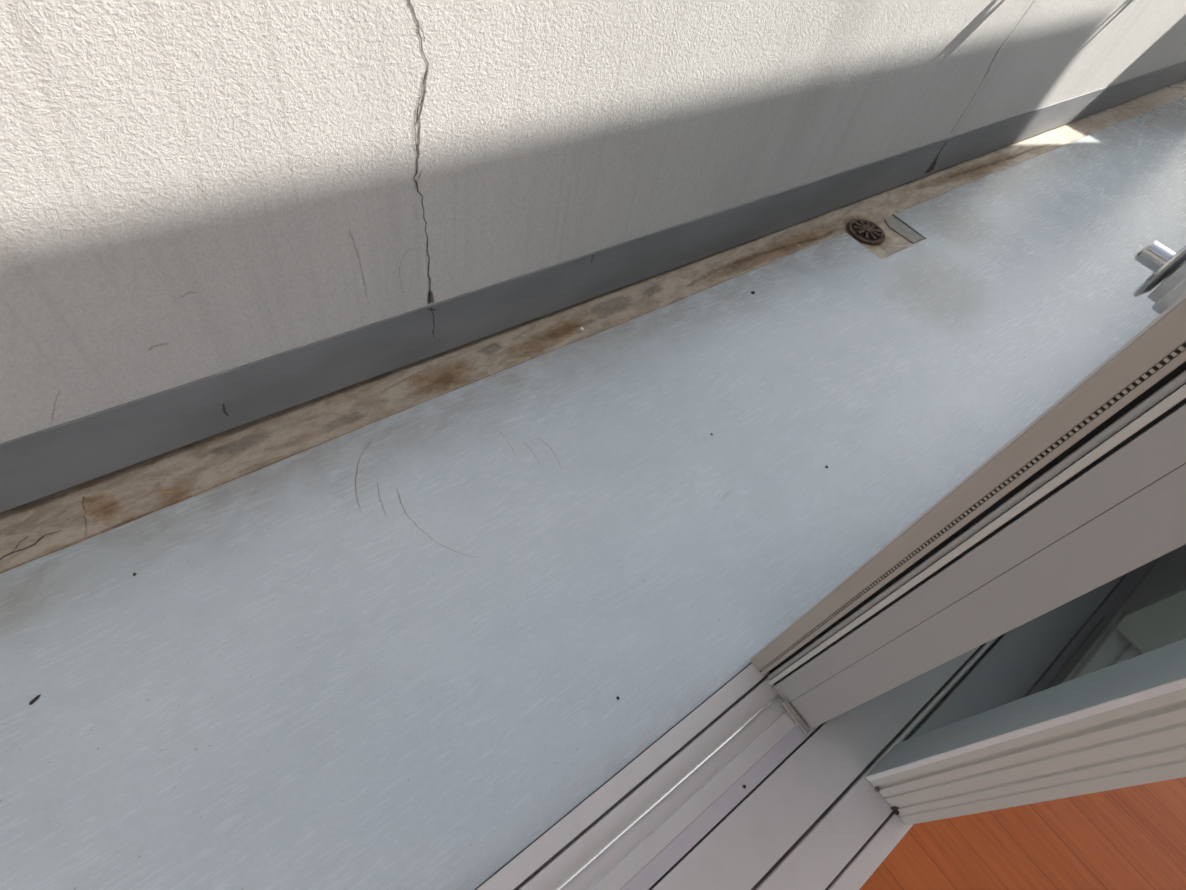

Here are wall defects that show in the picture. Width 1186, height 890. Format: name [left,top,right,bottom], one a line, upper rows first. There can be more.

crack [408,0,436,335]